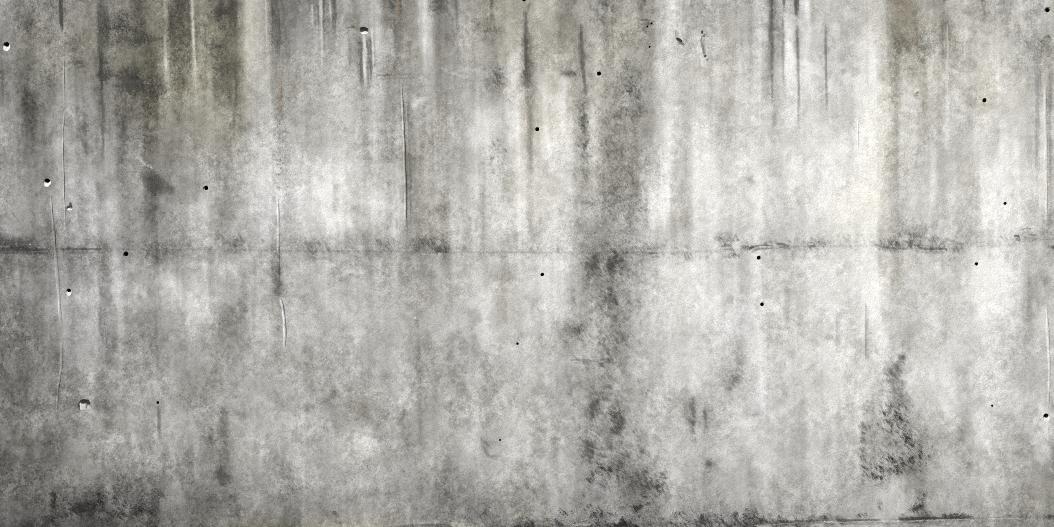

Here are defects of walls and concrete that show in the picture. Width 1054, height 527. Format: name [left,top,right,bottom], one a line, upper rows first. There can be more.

damp [98,5,162,112]
damp [585,254,621,313]
damp [505,386,659,527]
mould [861,355,930,480]